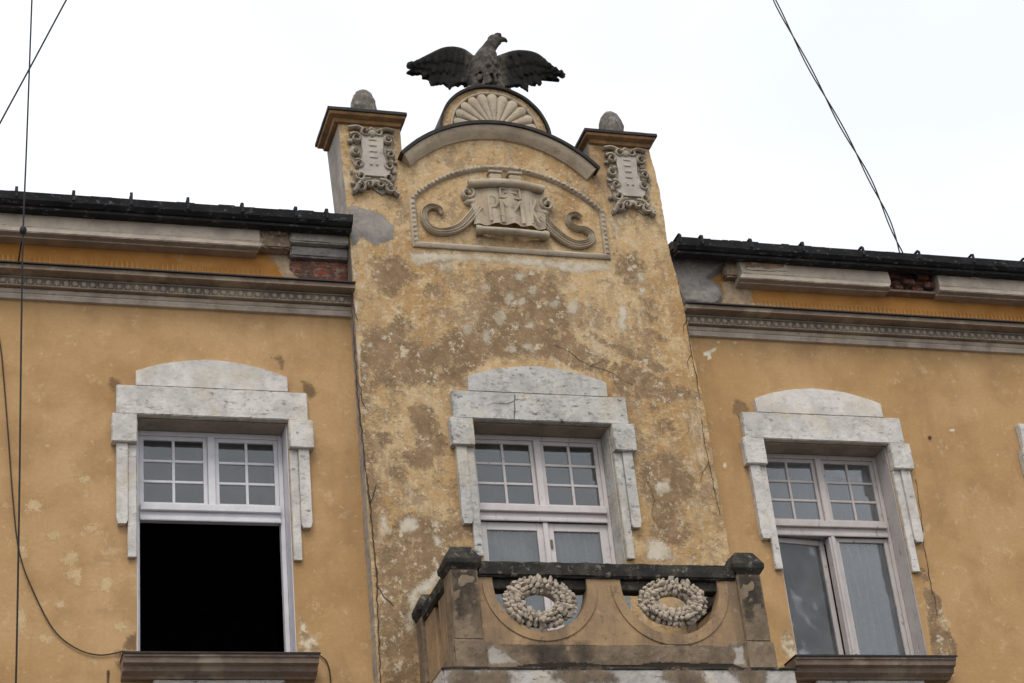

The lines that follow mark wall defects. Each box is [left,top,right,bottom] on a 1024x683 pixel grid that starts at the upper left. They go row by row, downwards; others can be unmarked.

crack [348,243,394,683]
flaking render [260,249,703,683]
crack [678,282,720,513]
peeling [701,339,740,362]
flaking render [885,272,936,299]
peeling [638,642,767,683]